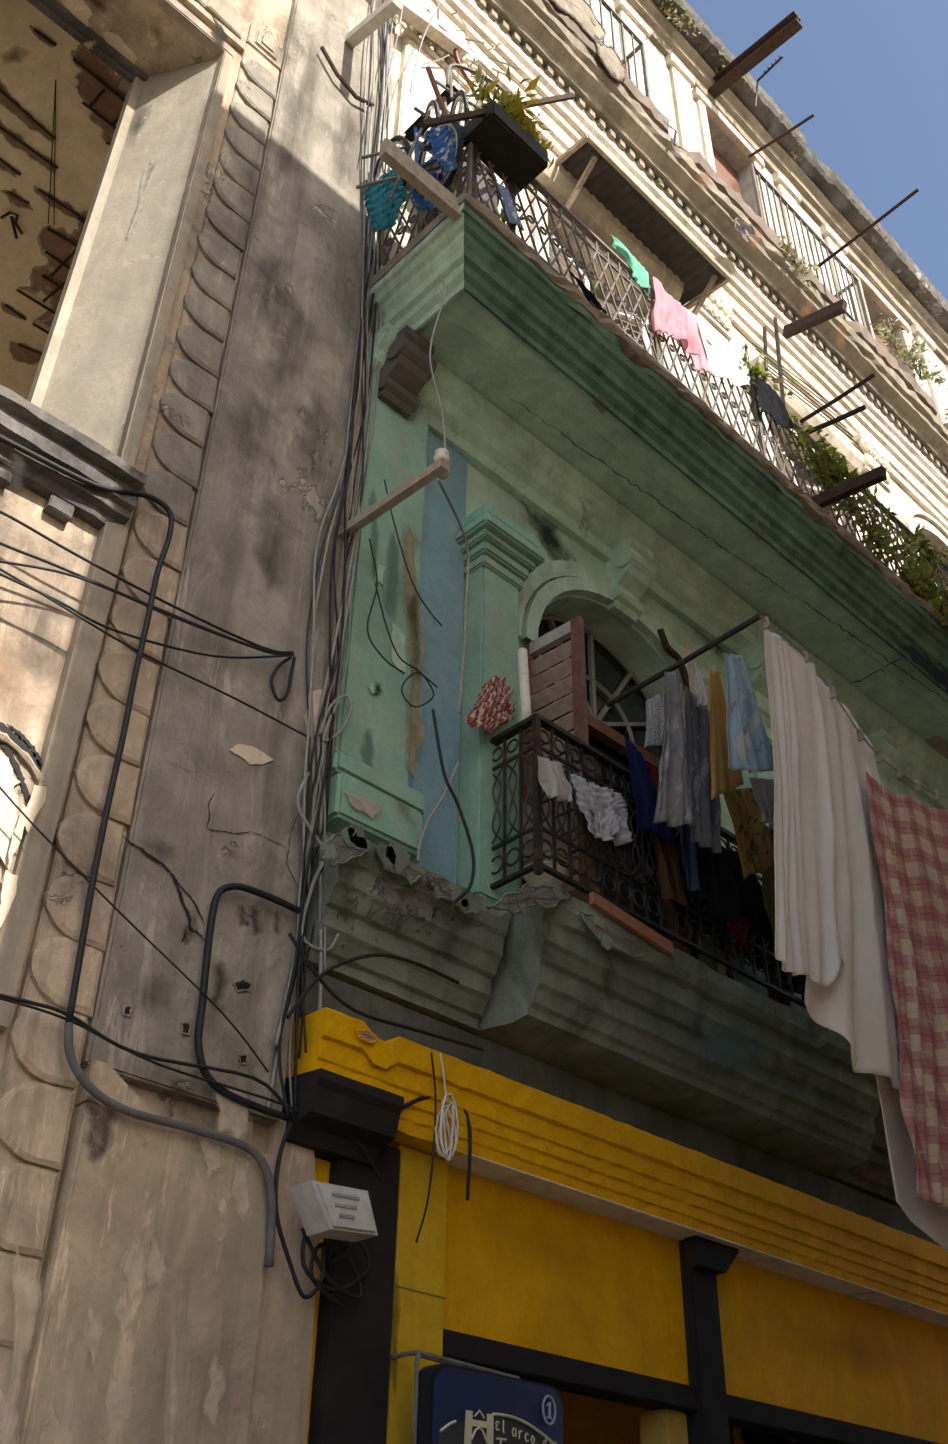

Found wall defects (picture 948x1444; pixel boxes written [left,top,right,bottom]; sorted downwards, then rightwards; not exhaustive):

peeling [61,0,137,64]
spalling [0,89,54,139]
spalling [73,58,125,145]
spalling [0,126,59,169]
spalling [7,188,85,223]
spalling [5,227,78,334]
peeling [304,689,324,737]
peeling [230,744,273,765]
peeling [0,753,47,928]